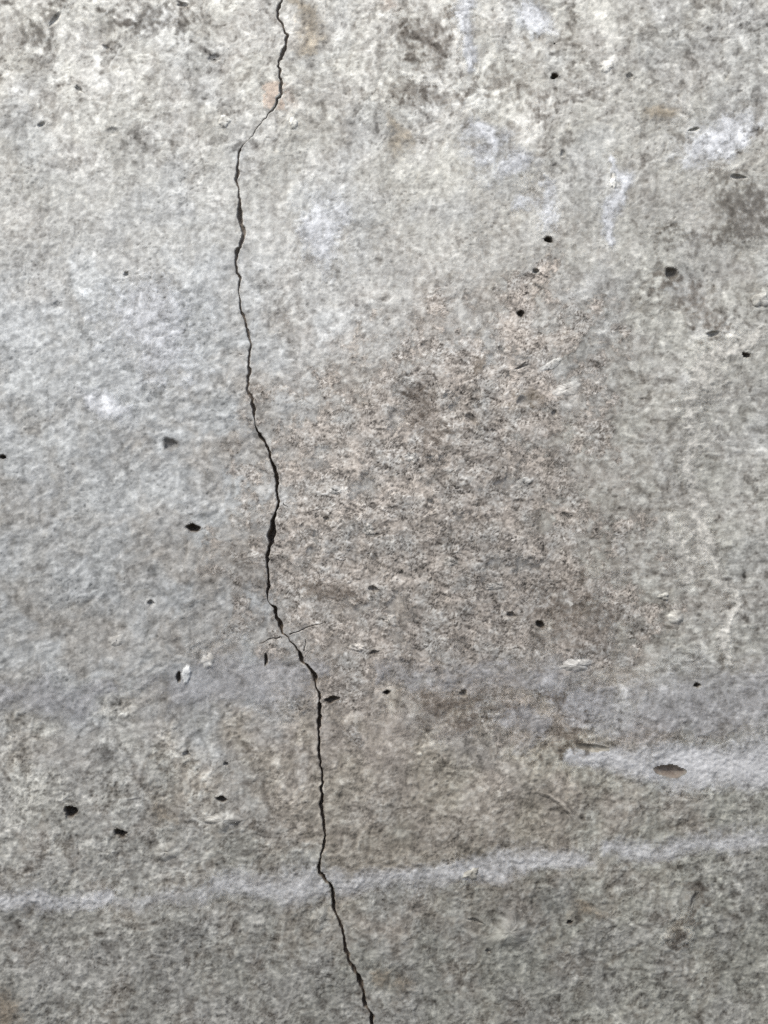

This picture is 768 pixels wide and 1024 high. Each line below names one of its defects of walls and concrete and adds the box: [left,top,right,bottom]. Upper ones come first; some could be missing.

crack [230,0,377,1024]